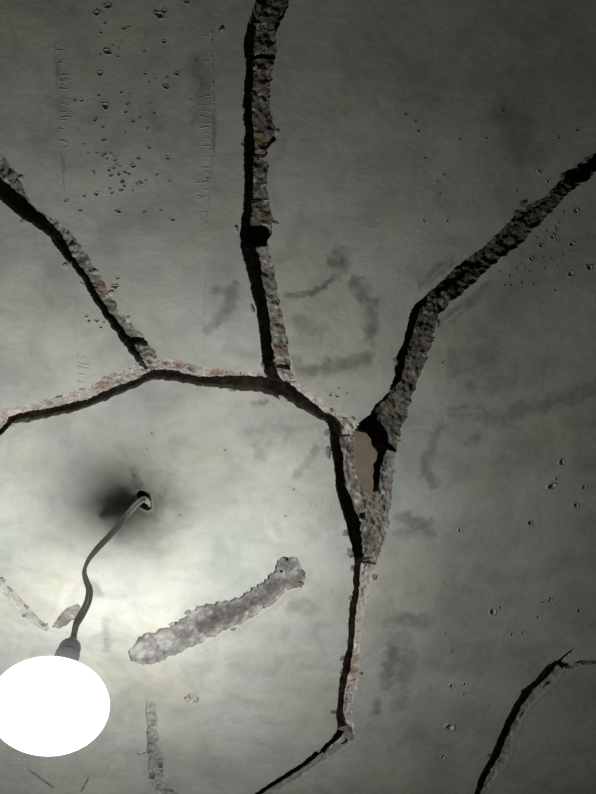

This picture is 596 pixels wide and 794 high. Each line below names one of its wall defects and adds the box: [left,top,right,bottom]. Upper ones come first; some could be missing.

crack [0,0,596,496]
crack [0,575,49,632]
spalling [128,557,306,665]
crack [255,420,395,794]
crack [21,765,54,789]
spalling [137,700,178,794]
crack [474,649,596,794]